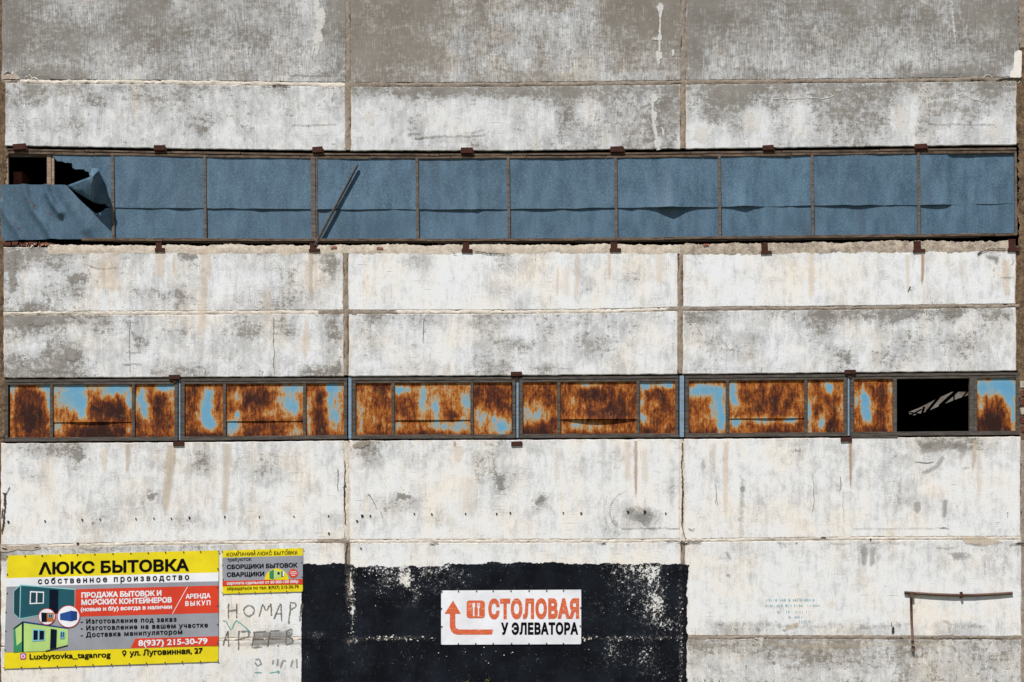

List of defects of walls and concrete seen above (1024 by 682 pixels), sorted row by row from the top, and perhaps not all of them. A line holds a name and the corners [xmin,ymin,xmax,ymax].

damp [653,3,674,65]
damp [650,93,664,150]